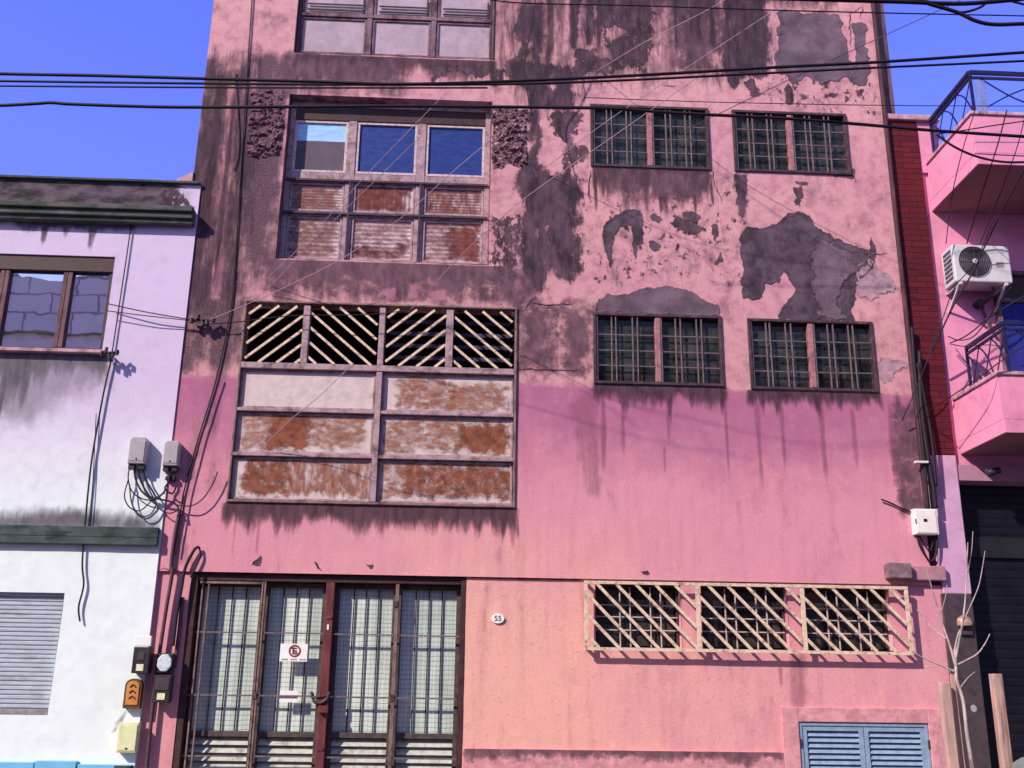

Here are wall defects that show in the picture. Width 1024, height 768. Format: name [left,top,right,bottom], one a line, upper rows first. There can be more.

peeling [774,9,871,105]
rust [287,185,339,257]
rust [353,187,411,259]
rust [425,189,481,262]
leakage [267,0,876,376]
peeling [595,286,720,316]
peeling [602,209,723,266]
peeling [739,211,895,321]
leakage [0,352,107,408]
leakage [593,384,726,413]
rust [239,376,513,501]
leakage [222,502,518,536]